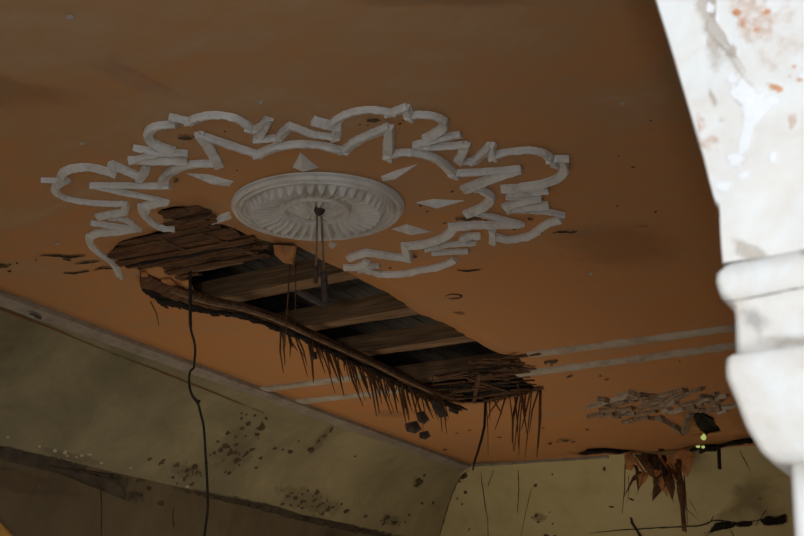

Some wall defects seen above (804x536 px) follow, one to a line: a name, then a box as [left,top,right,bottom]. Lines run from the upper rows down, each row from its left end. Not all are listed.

spalling [706,2,721,23]
peeling [733,1,770,31]
spalling [715,72,783,192]
flaking render [274,245,297,265]
crack [589,508,787,536]